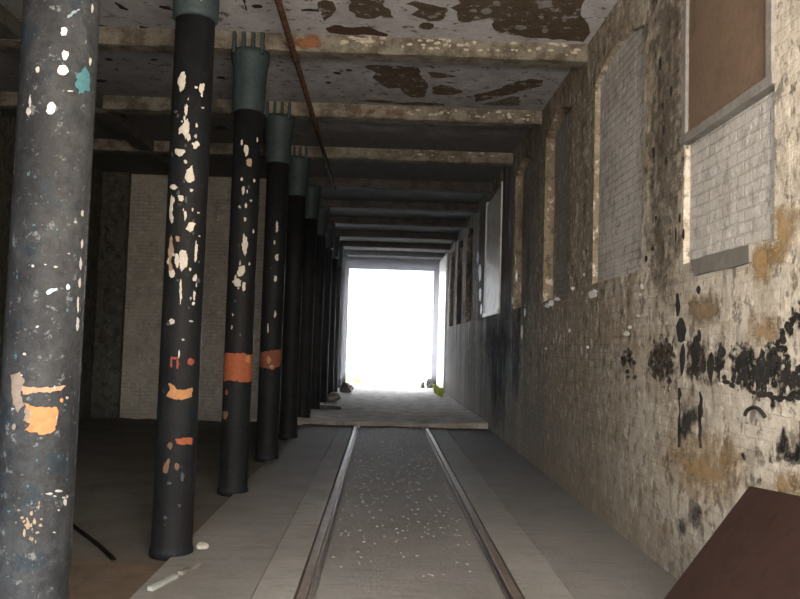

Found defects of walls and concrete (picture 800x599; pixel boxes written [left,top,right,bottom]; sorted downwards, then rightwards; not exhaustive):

peeling [301,0,394,47]
peeling [402,0,590,56]
peeling [177,72,186,92]
peeling [364,65,462,116]
peeling [167,98,200,309]
peeling [232,229,254,291]
leakage [676,293,714,382]
peeling [11,368,69,435]
peeling [166,383,193,400]
peeling [223,350,282,395]
peeling [163,437,193,485]
leakage [769,421,800,465]